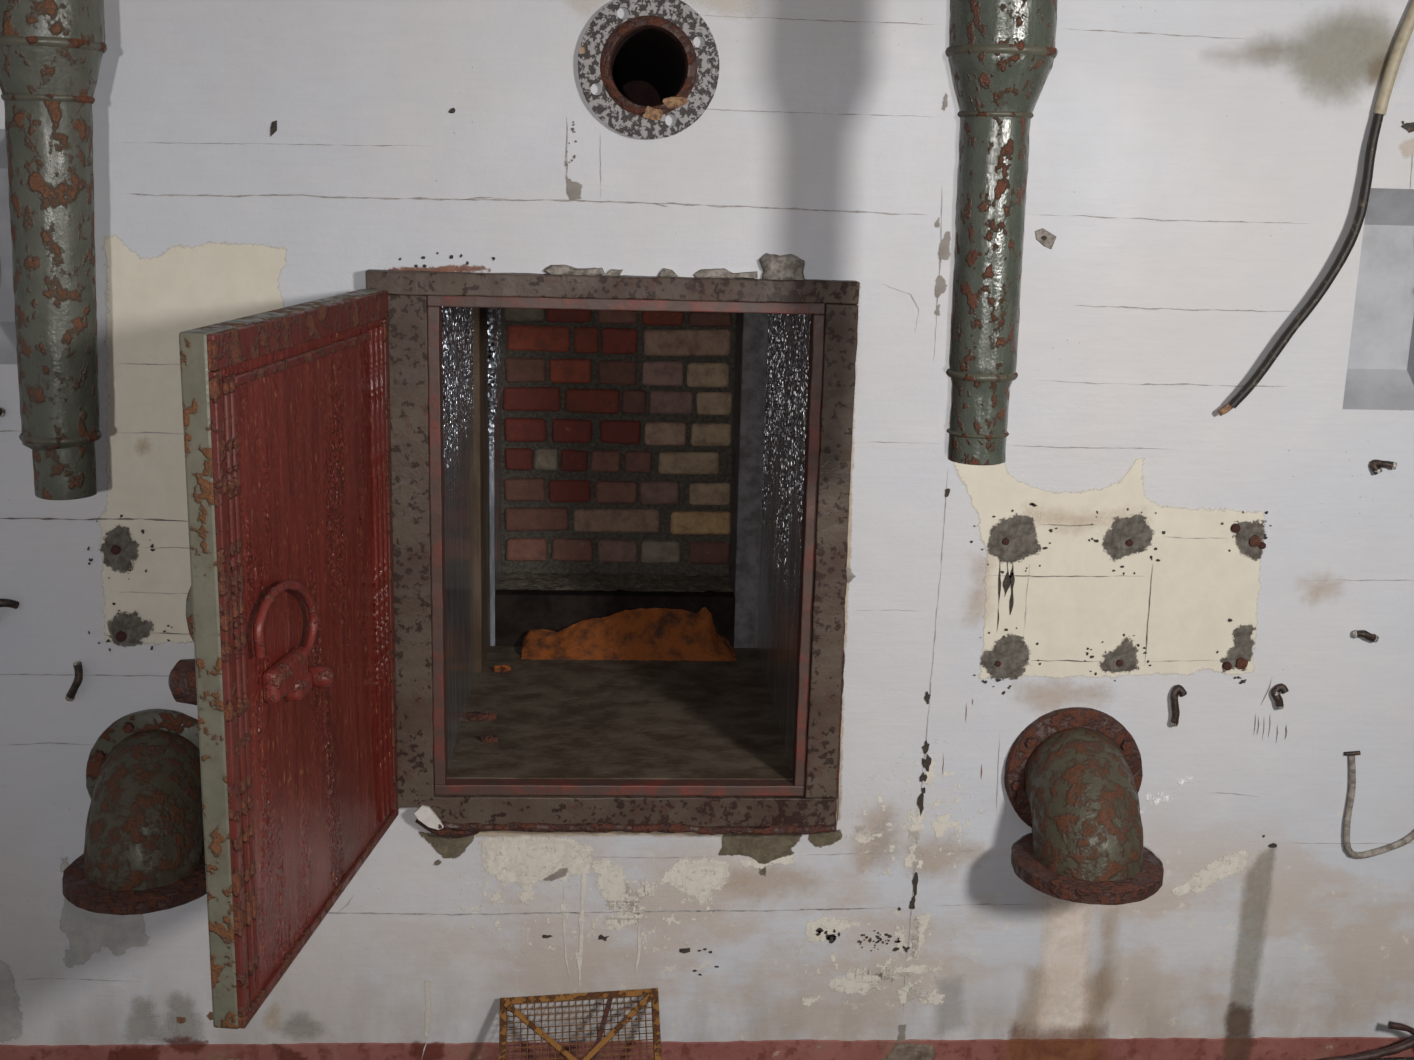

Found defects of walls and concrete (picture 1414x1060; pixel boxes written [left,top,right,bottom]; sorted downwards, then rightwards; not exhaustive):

leakage [1297,25,1390,88]
peeling [87,235,287,651]
peeling [945,459,1271,695]
peeling [415,740,983,1060]
leakage [1225,867,1270,1060]